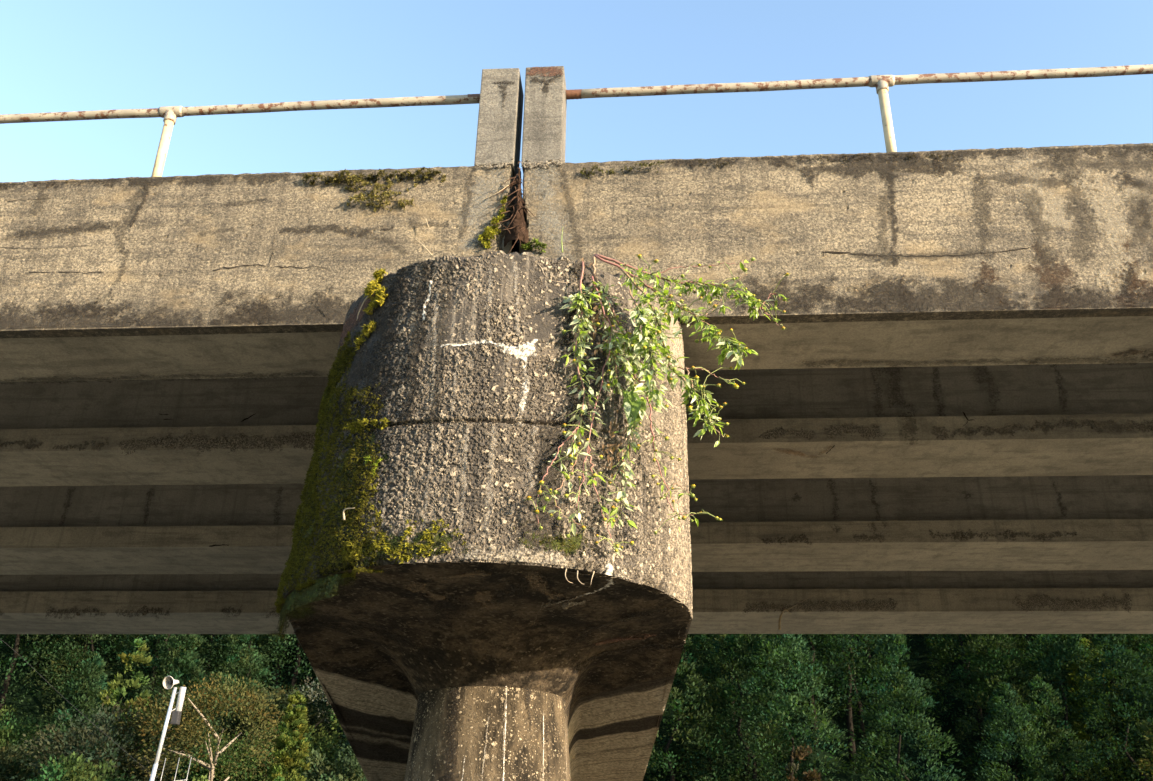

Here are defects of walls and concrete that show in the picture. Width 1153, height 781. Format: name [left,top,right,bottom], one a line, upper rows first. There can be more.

water stain [665,145,1153,314]
crack [823,248,1028,257]